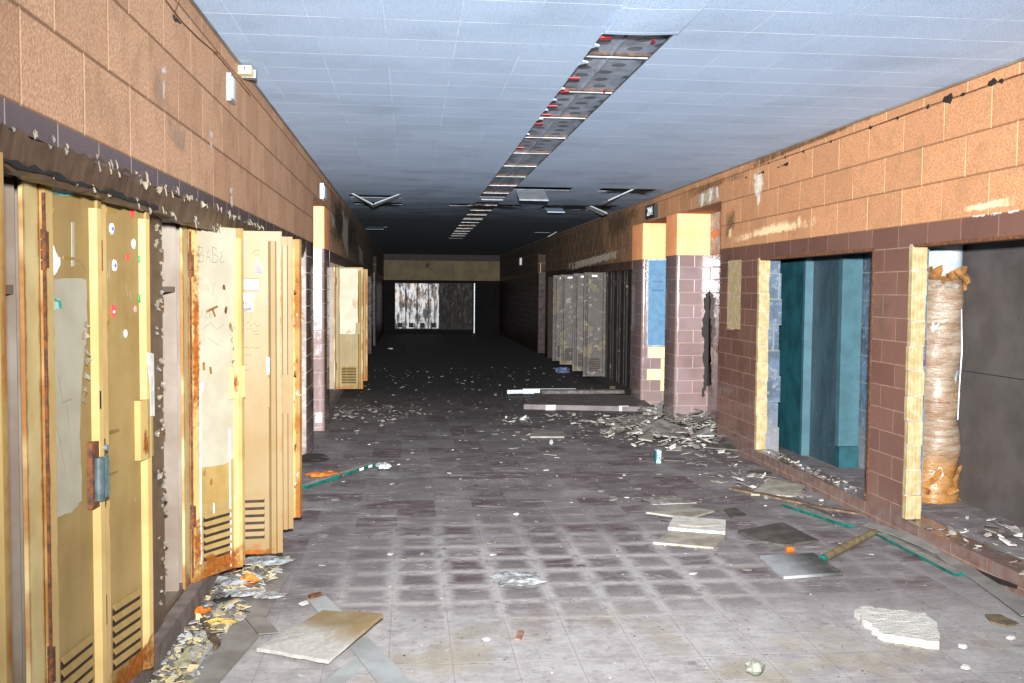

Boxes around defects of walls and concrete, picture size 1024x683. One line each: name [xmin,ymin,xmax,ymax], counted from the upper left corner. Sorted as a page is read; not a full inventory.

peeling [135,171,264,276]
spalling [697,186,742,330]
spalling [701,291,719,397]
corrosion [194,519,270,576]